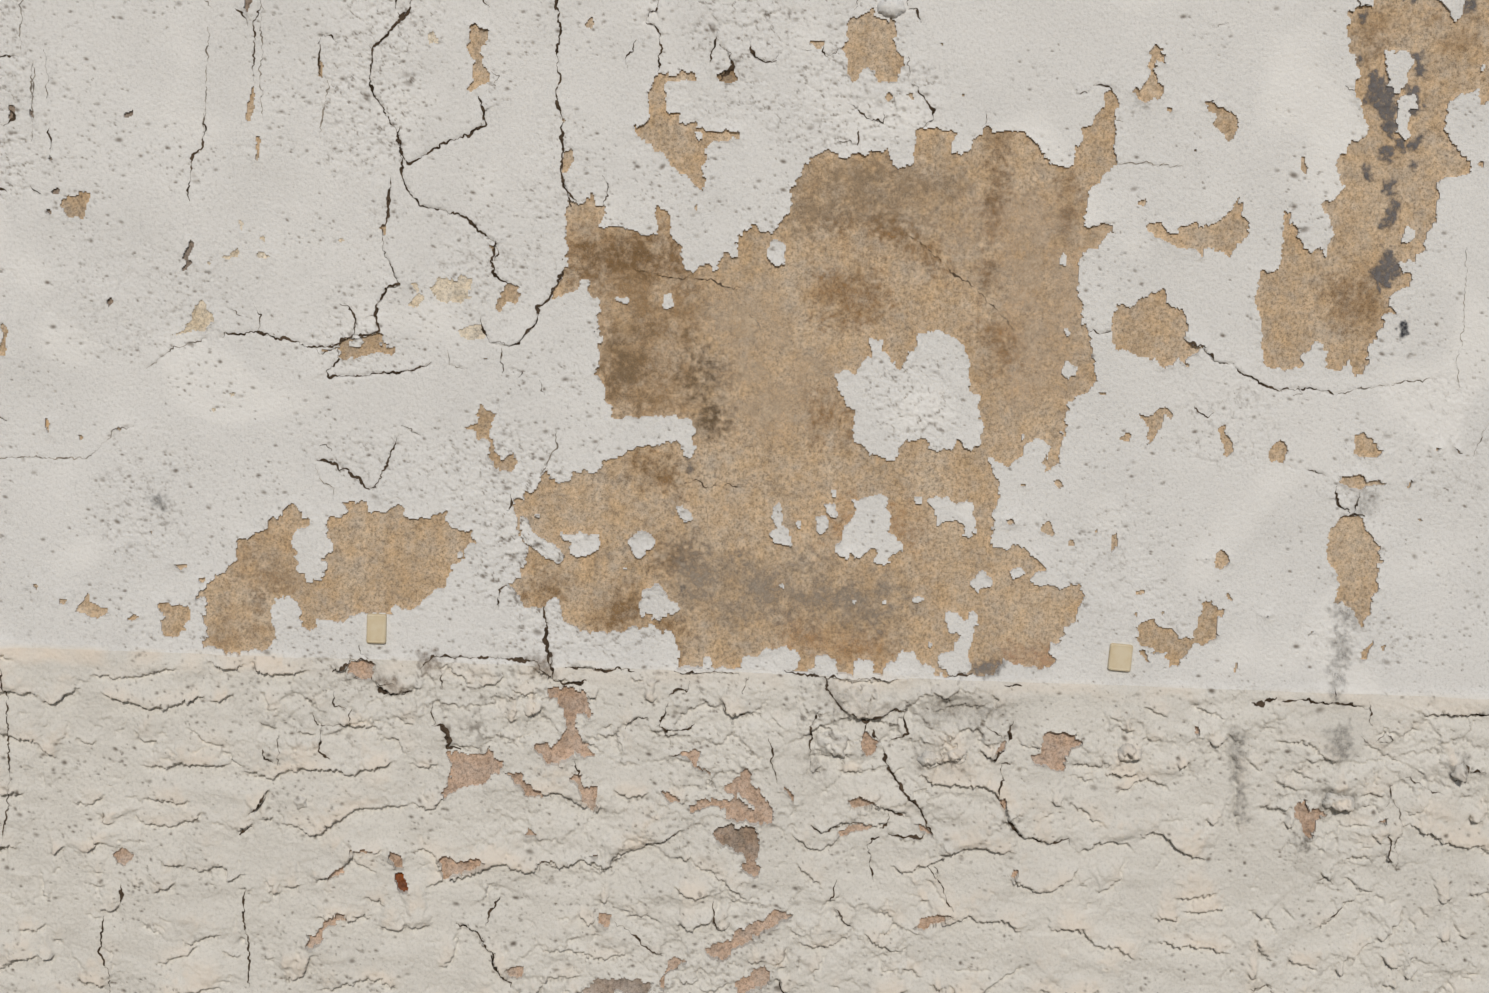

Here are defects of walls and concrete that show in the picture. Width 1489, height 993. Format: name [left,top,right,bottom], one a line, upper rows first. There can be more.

crack [554,0,609,207]
crack [147,0,566,393]
peeling [1254,0,1489,377]
peeling [508,44,1173,681]
peeling [1111,288,1205,369]
peeling [158,500,477,655]
peeling [1326,515,1385,659]
crack [313,607,634,759]
flaking render [662,749,773,877]
crack [784,670,954,912]
crack [957,722,1070,844]
crack [1252,691,1393,744]